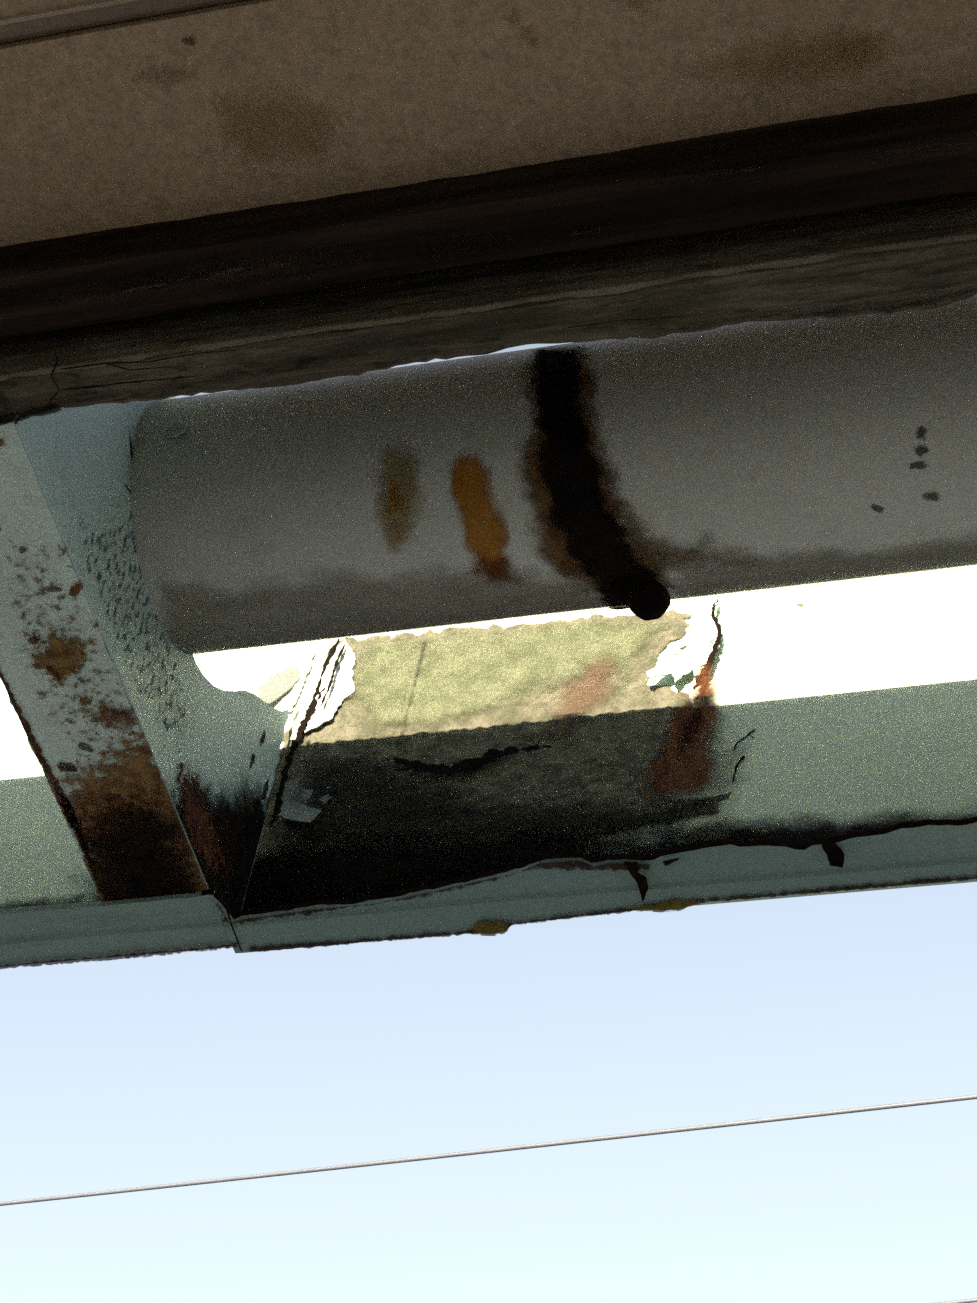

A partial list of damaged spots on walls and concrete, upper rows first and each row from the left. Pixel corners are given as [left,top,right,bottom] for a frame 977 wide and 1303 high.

rust [382,452,416,544]
rust [451,457,512,581]
rust [522,346,717,621]
peeling [198,597,733,857]
rust [0,541,977,927]
rust [0,929,475,969]